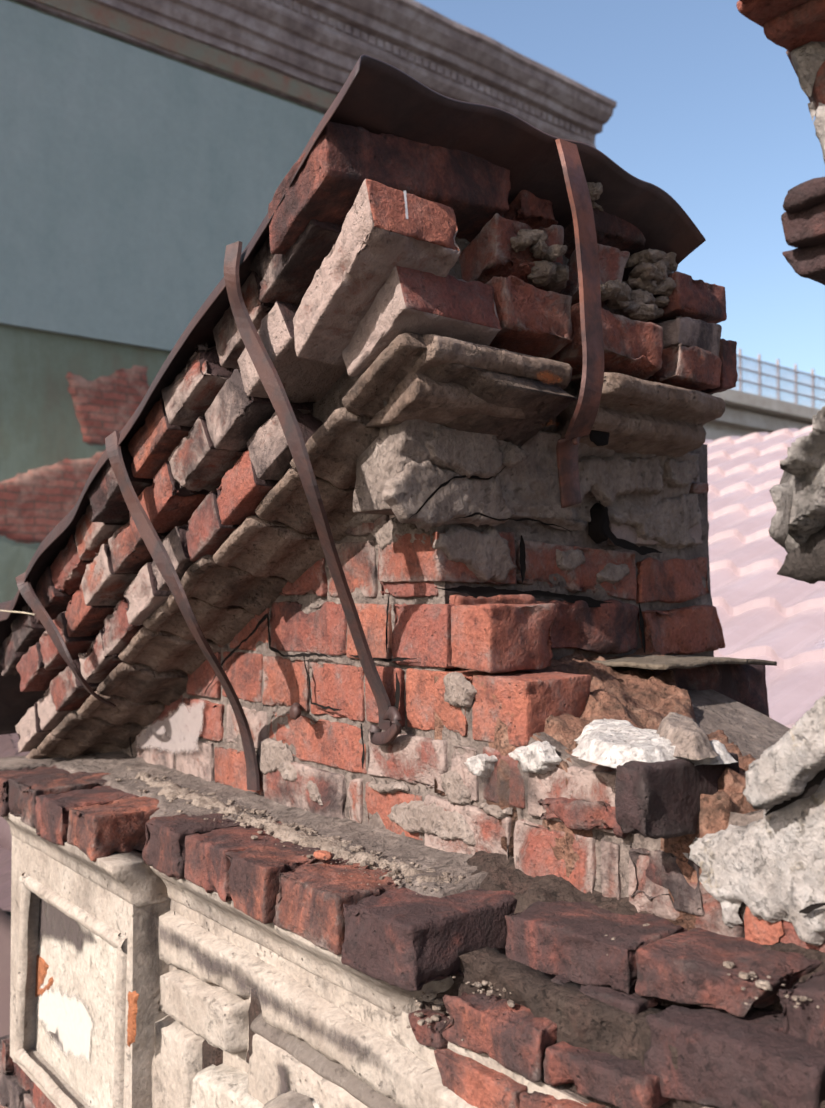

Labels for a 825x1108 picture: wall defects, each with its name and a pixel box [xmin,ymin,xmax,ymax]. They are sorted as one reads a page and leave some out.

peeling [790,41,825,163]
crack [409,466,506,519]
crack [435,512,612,608]
spalling [588,503,610,544]
crack [638,603,646,653]
crack [205,593,417,769]
peeling [443,672,477,708]
peeling [368,741,562,846]
crack [765,768,825,816]
spalling [408,779,825,1108]
peeling [35,954,93,1062]
spalling [127,991,139,1047]